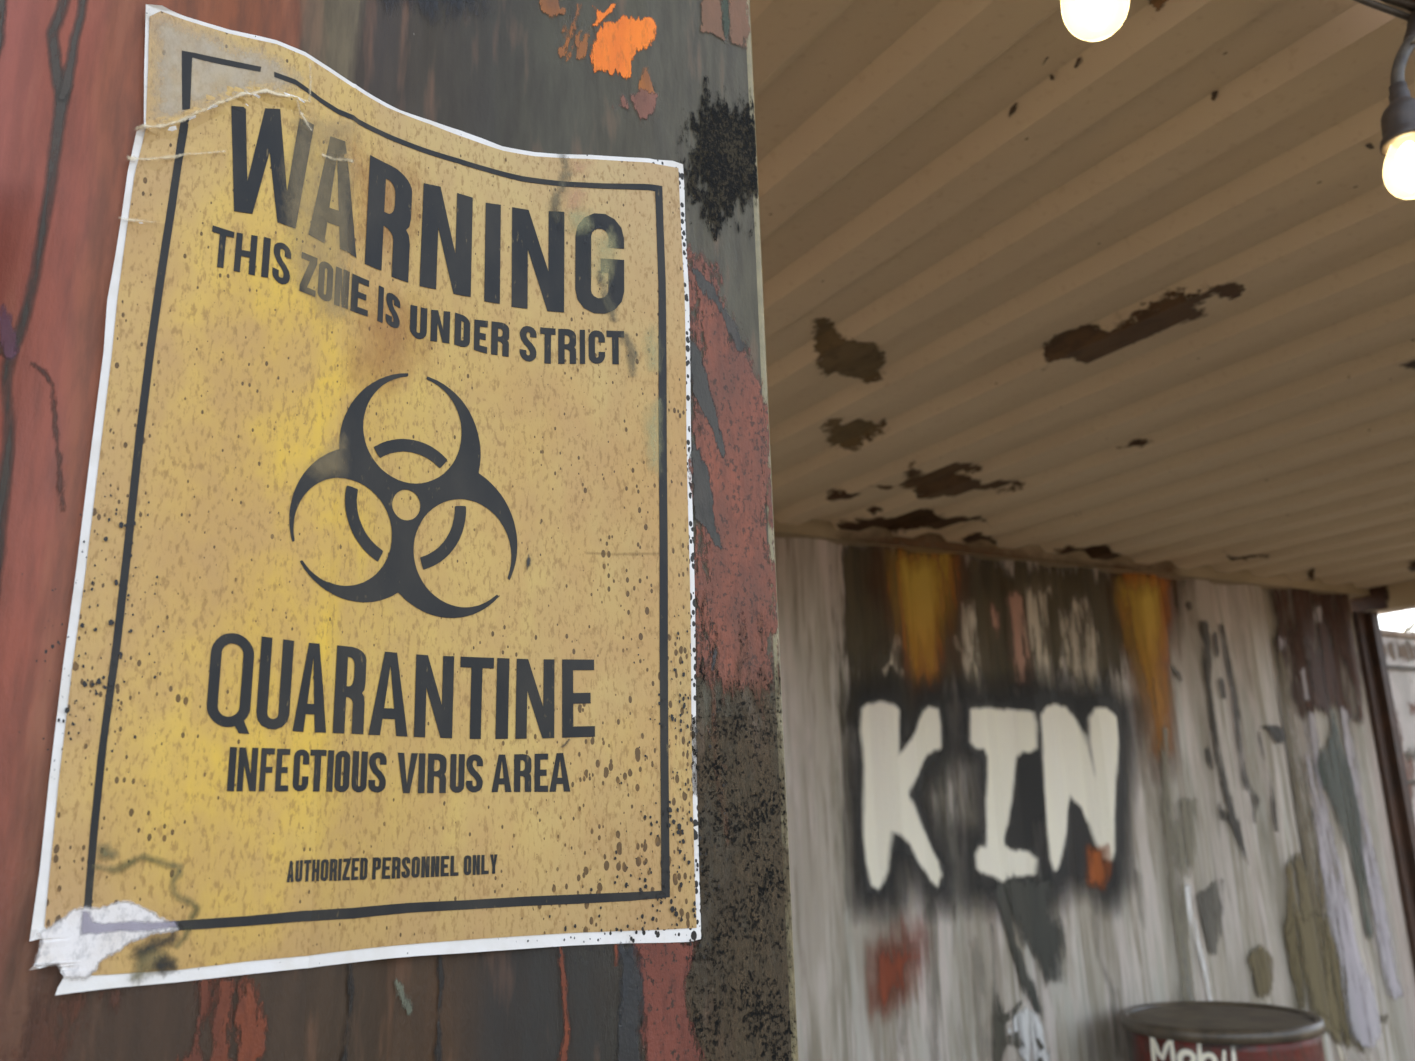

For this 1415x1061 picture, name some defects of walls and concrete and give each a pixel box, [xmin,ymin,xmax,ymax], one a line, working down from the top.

peeling [1149,0,1168,11]
peeling [539,0,658,121]
peeling [811,318,887,383]
peeling [1040,282,1246,370]
rust [686,244,780,719]
peeling [827,459,1025,545]
peeling [1053,545,1122,560]